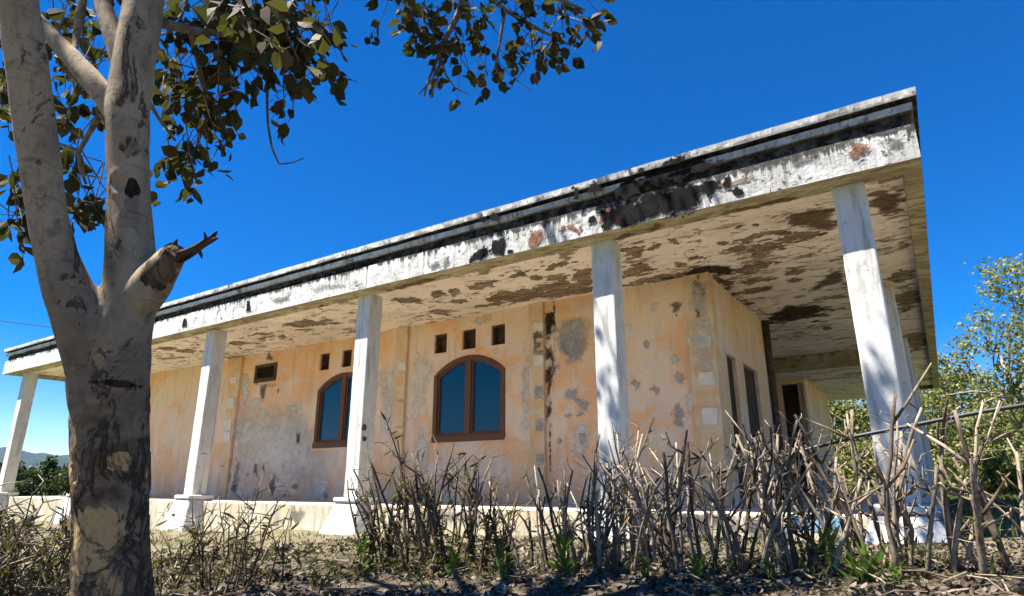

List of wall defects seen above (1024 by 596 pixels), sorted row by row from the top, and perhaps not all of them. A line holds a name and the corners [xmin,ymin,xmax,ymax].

damp [572,154,838,240]
peeling [390,260,593,324]
peeling [620,238,707,287]
peeling [716,224,823,295]
peeling [887,269,921,313]
flaking render [521,319,586,430]
flaking render [671,355,694,426]